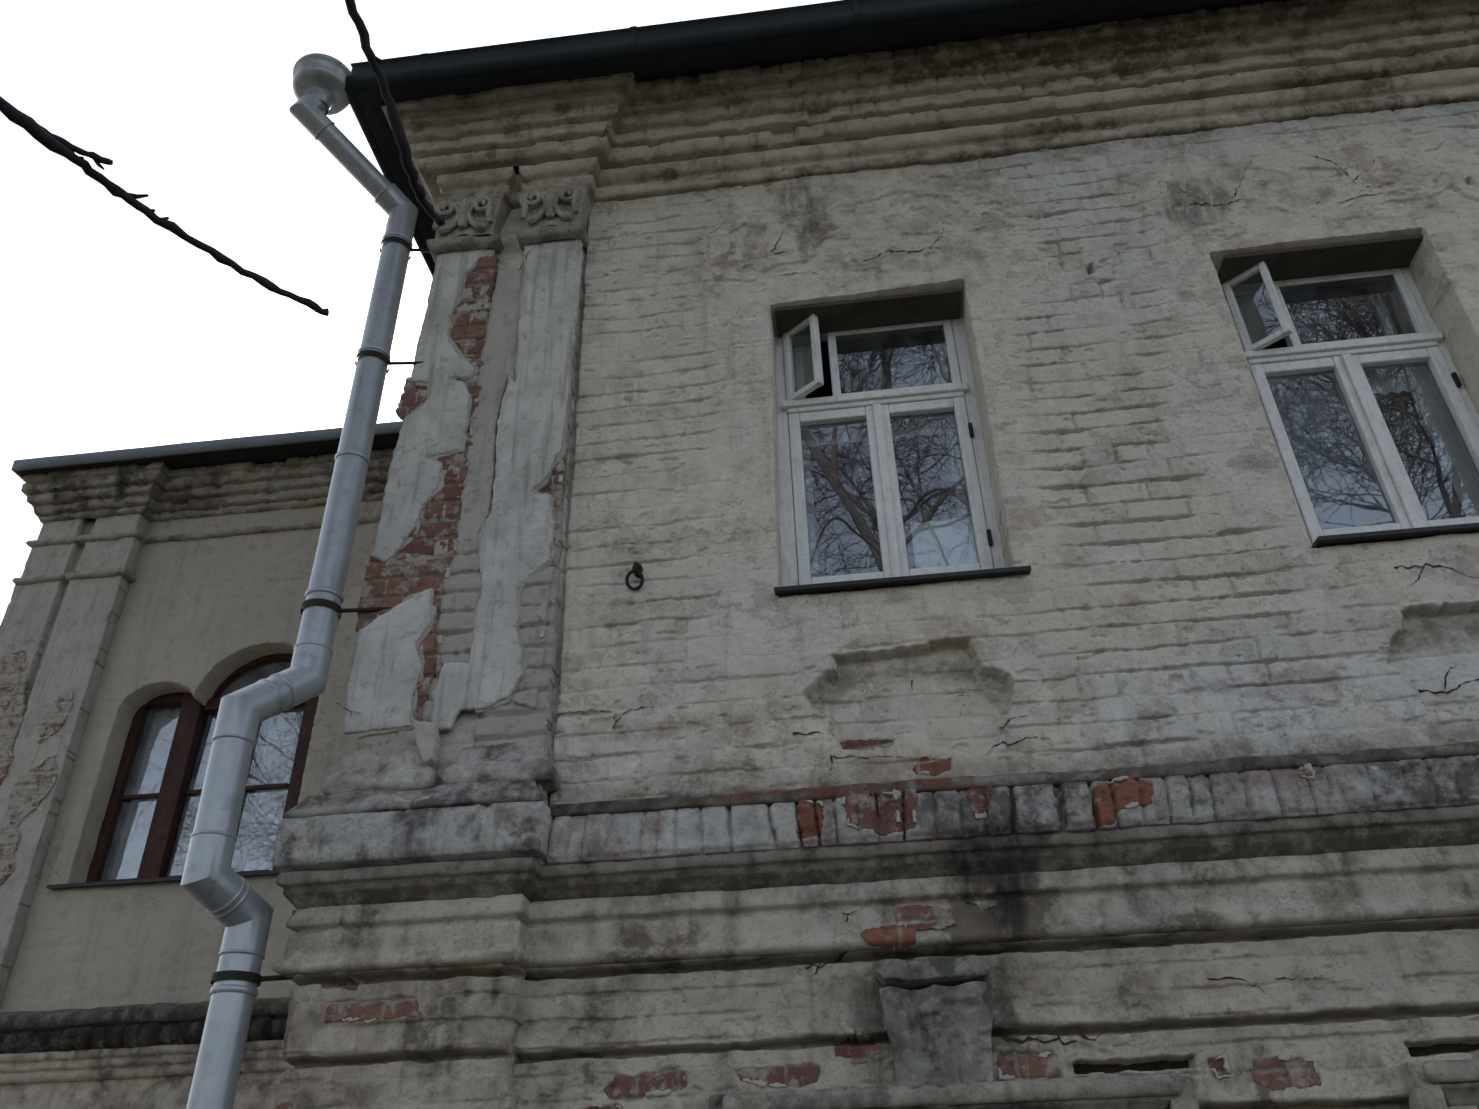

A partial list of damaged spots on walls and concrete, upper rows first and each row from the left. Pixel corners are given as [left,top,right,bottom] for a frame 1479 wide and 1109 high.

flaking render [355,254,499,766]
crack [1394,563,1478,586]
crack [1418,667,1479,694]
flaking render [0,649,75,886]
spalling [842,755,951,836]
spalling [1092,776,1154,830]
spalling [861,905,956,952]
spalling [834,1028,883,1064]
spalling [586,1070,687,1109]
spalling [735,1064,820,1088]
spalling [996,1051,1189,1081]
spalling [1252,1053,1322,1091]